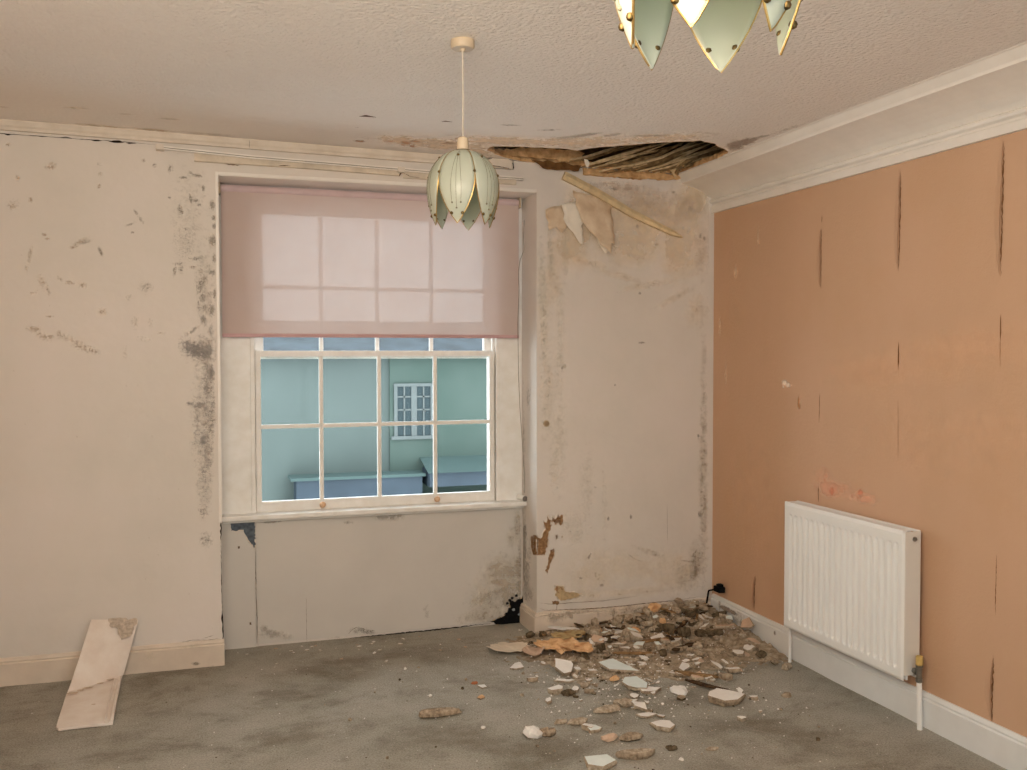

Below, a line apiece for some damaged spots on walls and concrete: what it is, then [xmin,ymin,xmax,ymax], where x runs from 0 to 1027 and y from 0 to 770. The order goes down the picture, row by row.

spalling [487,141,728,174]
leakage [178,172,216,321]
leakage [181,331,214,412]
peeling [231,522,256,548]
flaking render [531,513,563,574]
flaking render [552,584,583,605]